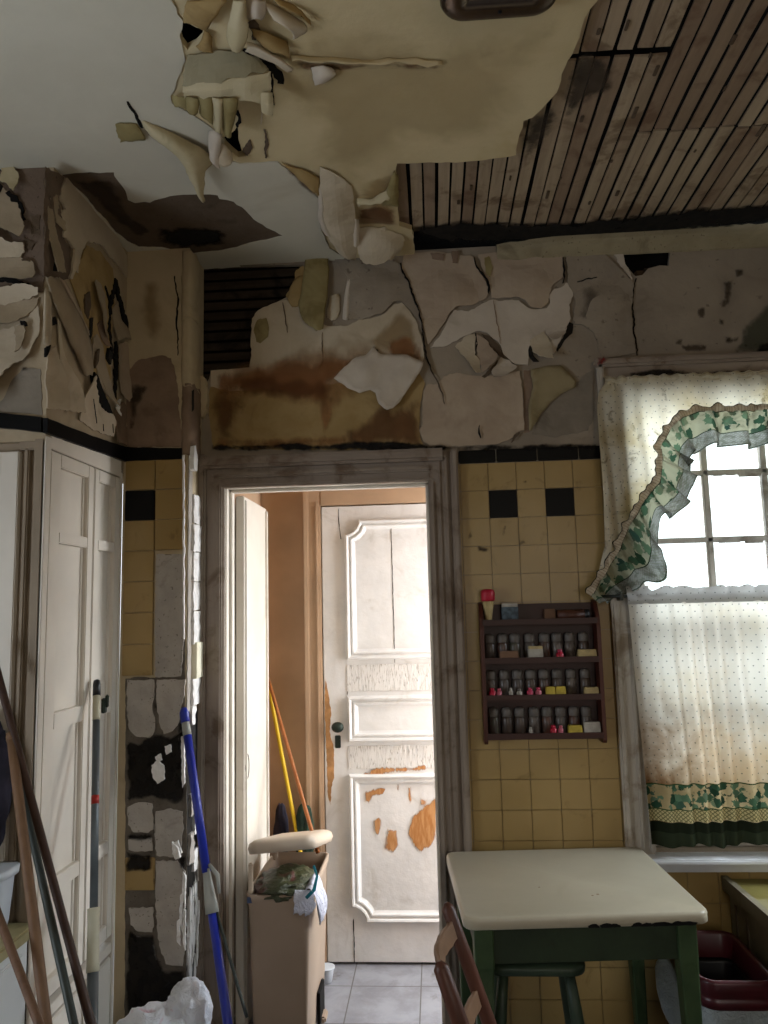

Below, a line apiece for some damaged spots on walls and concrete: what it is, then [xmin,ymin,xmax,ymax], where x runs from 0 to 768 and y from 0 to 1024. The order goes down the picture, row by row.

crack [474,257,490,293]
crack [562,257,597,283]
crack [400,263,433,373]
crack [631,278,639,355]
spalling [0,0,594,1018]